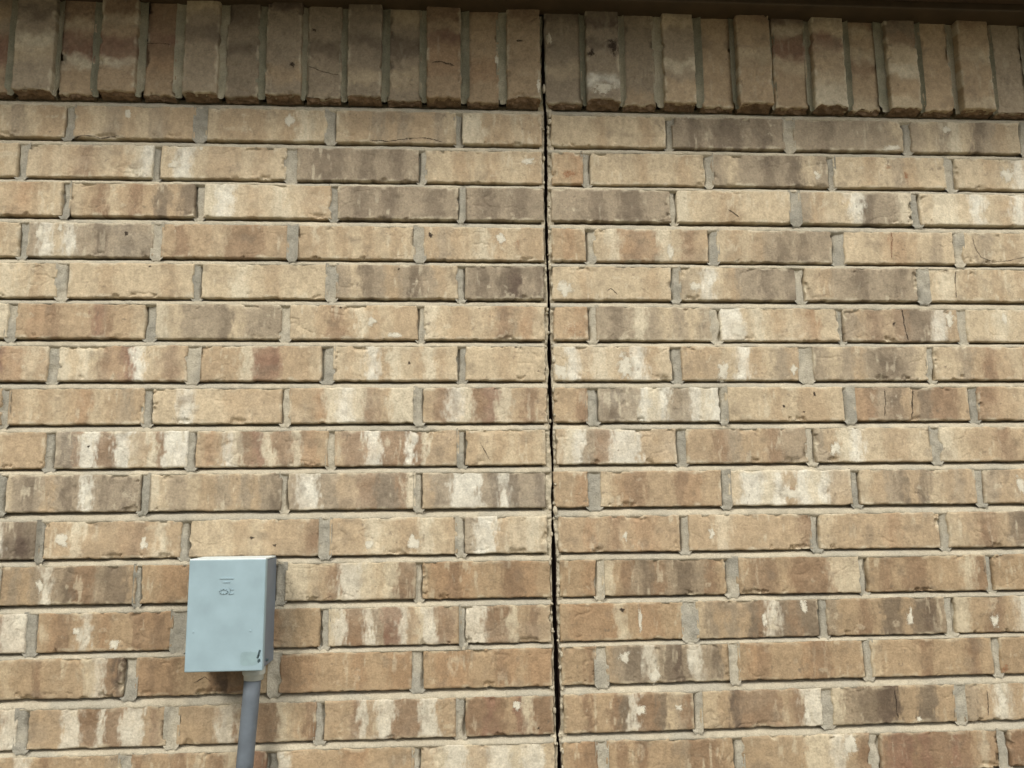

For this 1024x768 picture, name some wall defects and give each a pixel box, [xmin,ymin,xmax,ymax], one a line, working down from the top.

crack [541,17,564,768]